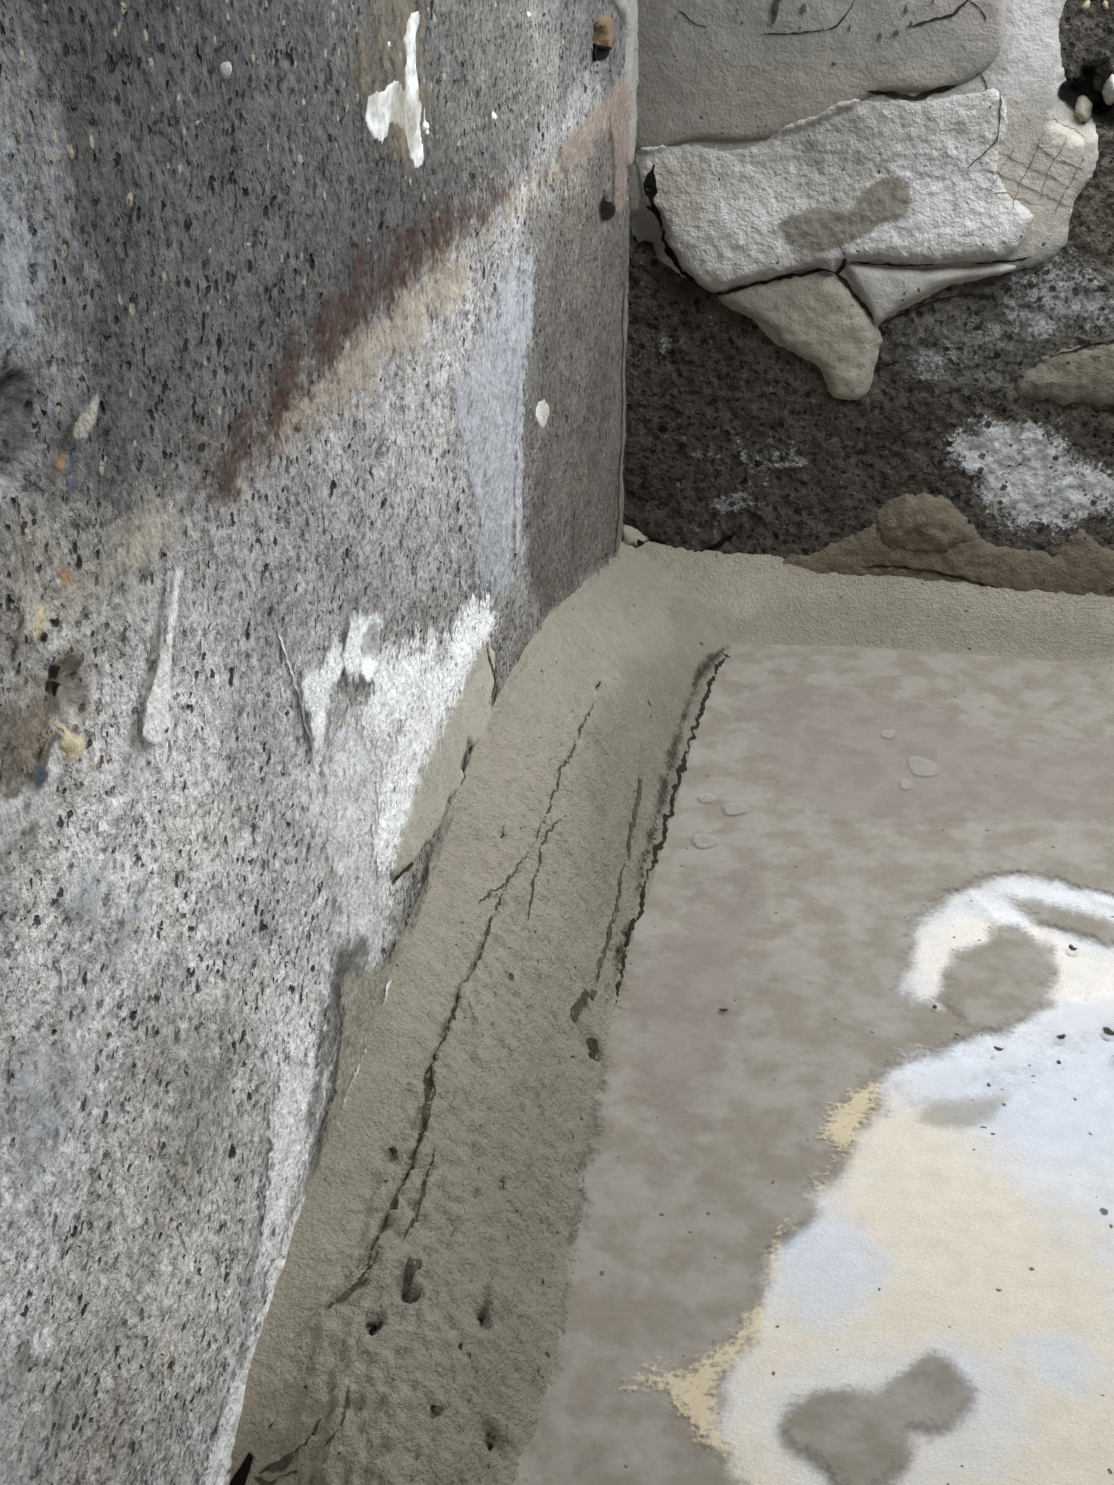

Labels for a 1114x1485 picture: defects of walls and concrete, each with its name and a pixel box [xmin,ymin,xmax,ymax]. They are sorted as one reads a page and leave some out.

crack [760,0,855,35]
crack [908,0,986,27]
crack [868,74,1002,168]
crack [644,164,1033,323]
crack [1056,341,1114,355]
crack [606,645,731,1003]
crack [325,703,595,1310]
damp [512,644,1114,1485]